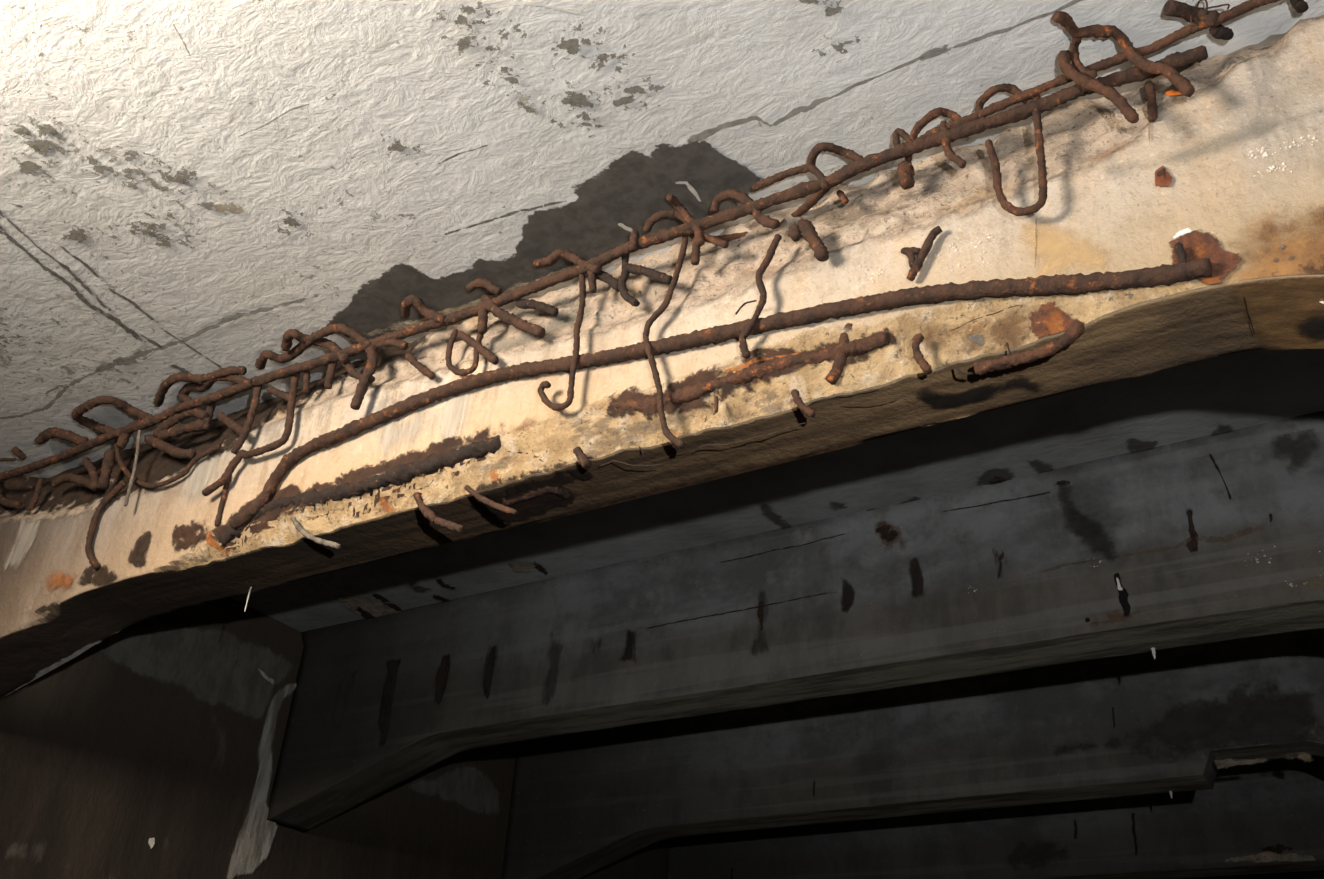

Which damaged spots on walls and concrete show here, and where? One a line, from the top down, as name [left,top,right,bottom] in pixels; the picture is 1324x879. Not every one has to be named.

crack [688,0,1082,142]
corrosion [1155,166,1172,186]
crack [0,204,319,419]
spalling [0,0,1324,570]
corrosion [923,302,1084,349]
corrosion [1169,213,1324,349]
corrosion [605,328,897,436]
corrosion [918,378,1040,408]
corrosion [171,427,499,556]
corrosion [47,565,117,588]
corrosion [128,531,151,567]
spalling [1114,573,1131,617]